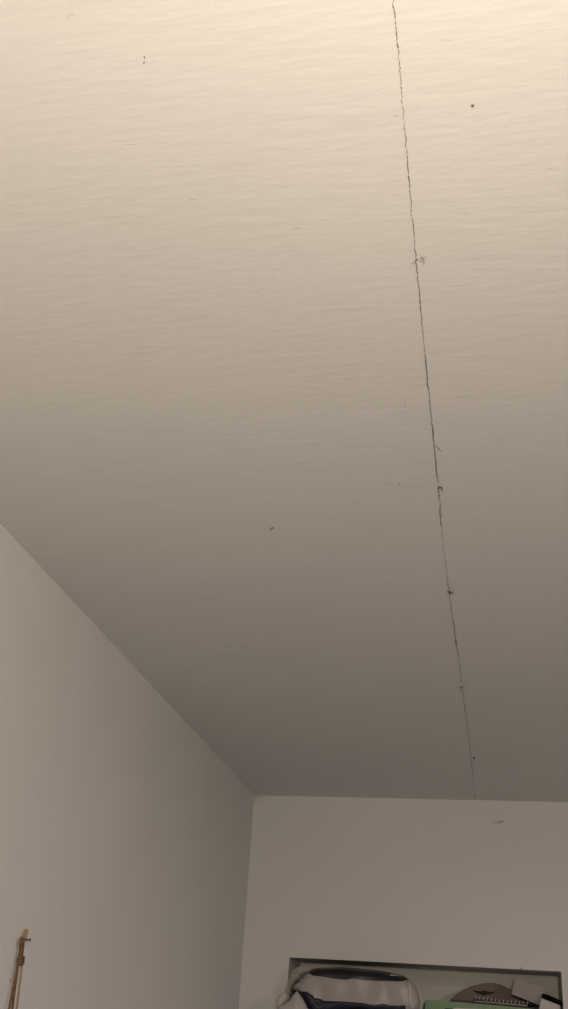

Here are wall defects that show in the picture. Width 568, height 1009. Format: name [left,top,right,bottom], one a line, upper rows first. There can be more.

crack [392,5,441,497]